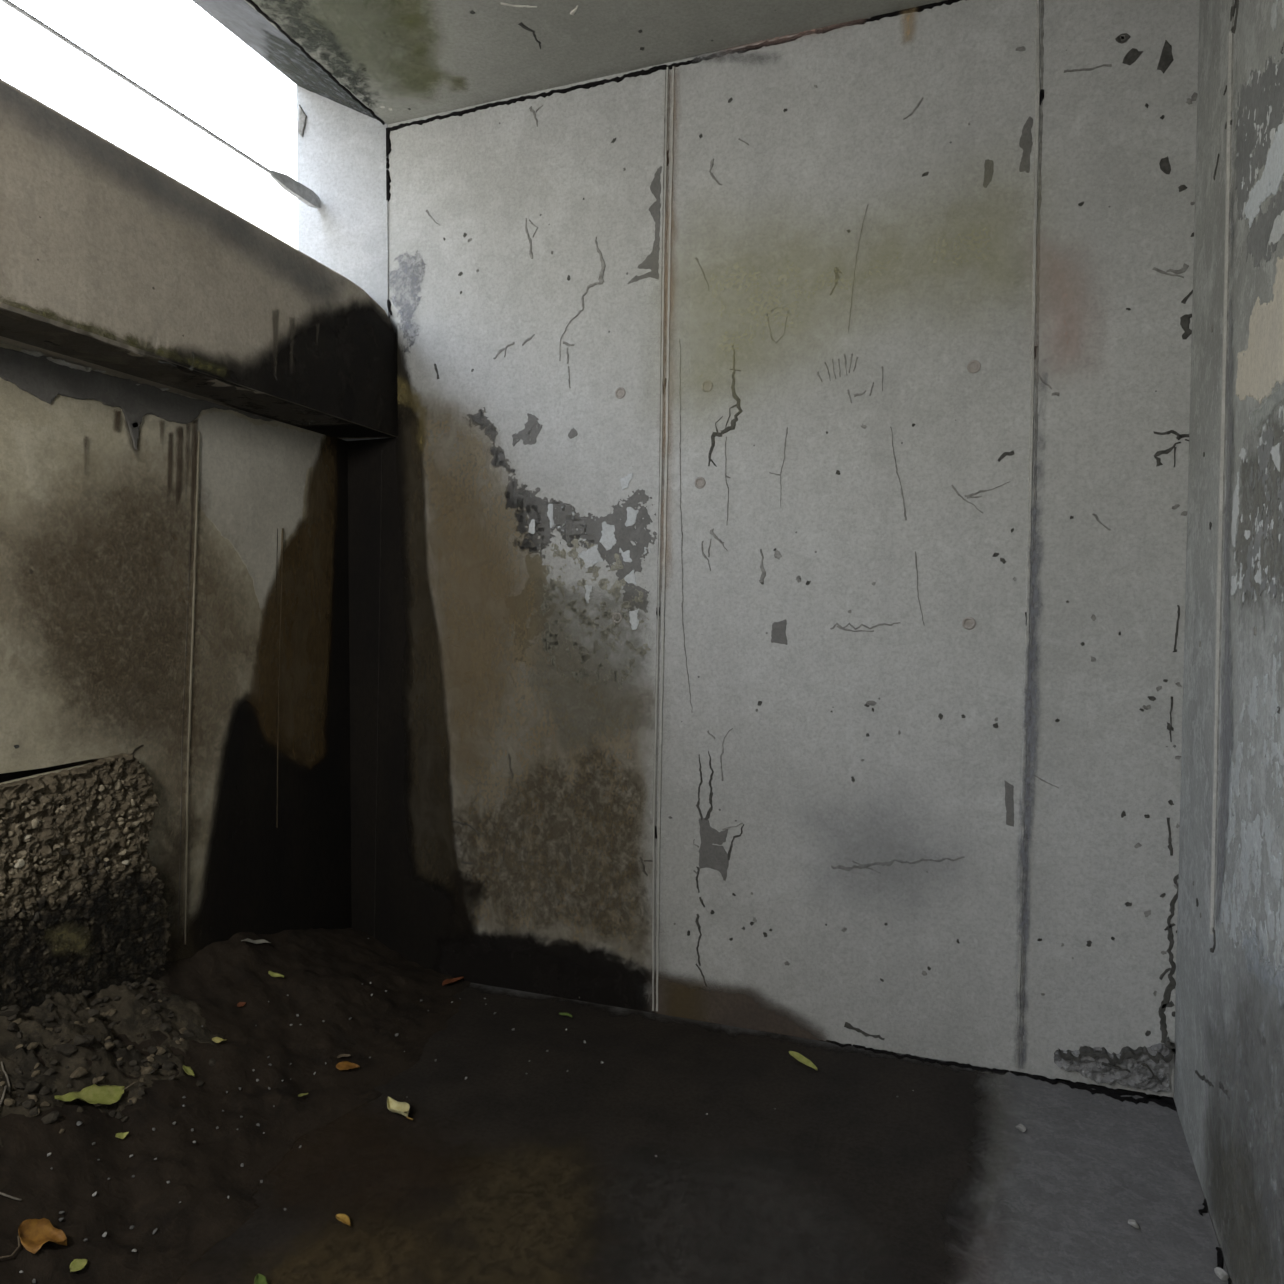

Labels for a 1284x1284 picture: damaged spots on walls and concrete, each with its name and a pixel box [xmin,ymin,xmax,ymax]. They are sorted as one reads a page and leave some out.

crack [493,237,606,388]
peeling [1230,0,1284,605]
crack [0,745,144,783]
water stain [0,252,997,1284]
peeling [463,407,657,690]
crack [679,339,743,707]
water stain [1018,505,1040,945]
crack [1167,696,1175,742]
crack [1173,605,1181,651]
crack [695,914,707,986]
spalling [1054,1030,1176,1093]
crack [1158,818,1179,1043]